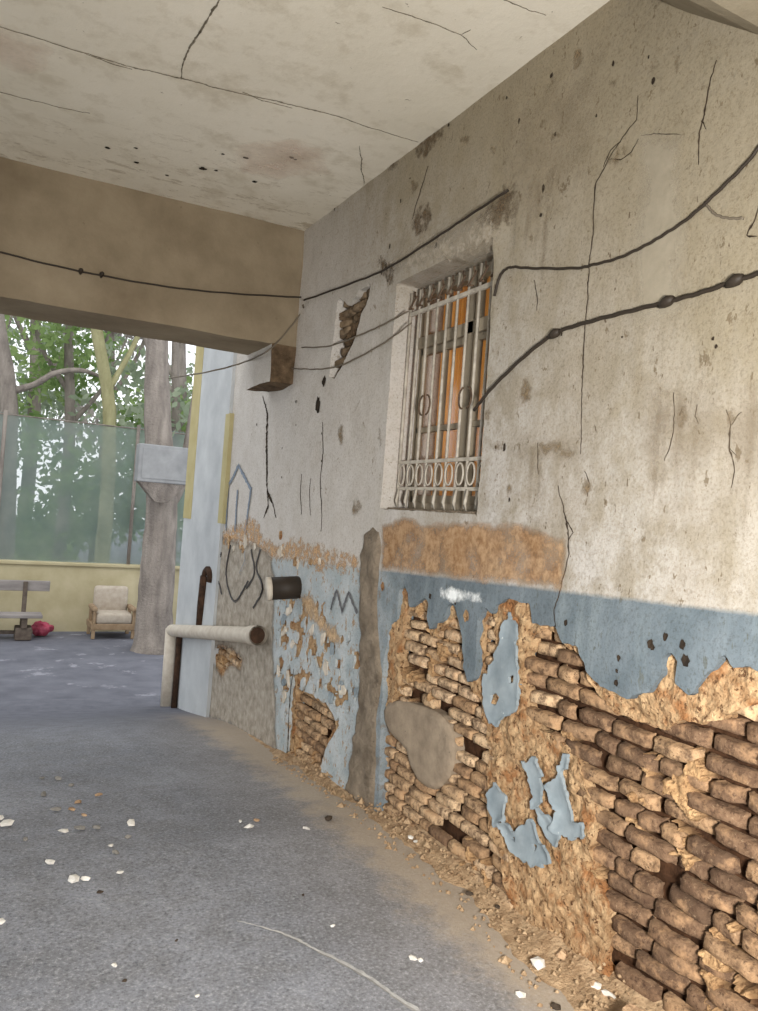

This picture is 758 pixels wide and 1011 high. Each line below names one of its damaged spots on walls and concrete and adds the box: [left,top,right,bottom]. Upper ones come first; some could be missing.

crack [0,0,417,182]
crack [746,210,758,238]
spalling [335,289,370,373]
flaking render [223,518,359,574]
crack [537,443,573,627]
spalling [215,645,242,678]
spalling [275,597,360,764]
spalling [383,588,758,1011]